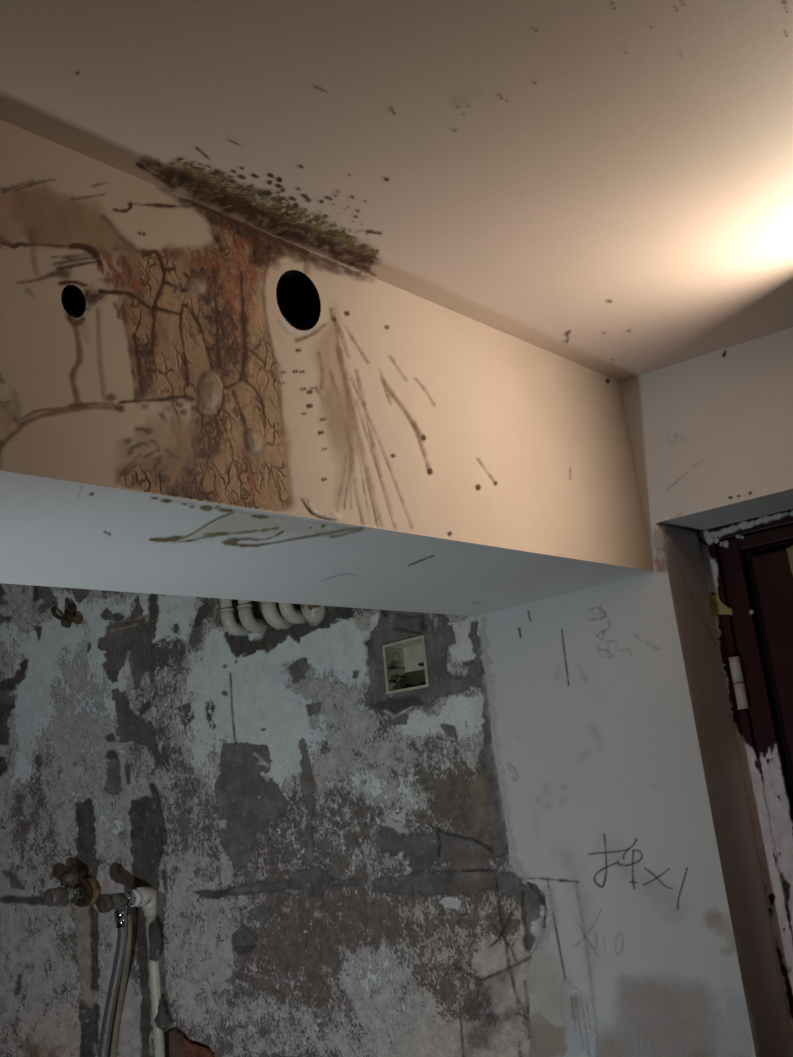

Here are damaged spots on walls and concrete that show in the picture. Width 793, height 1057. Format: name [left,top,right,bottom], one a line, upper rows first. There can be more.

damp [0,310,123,466]
crack [0,203,260,455]
damp [97,158,378,547]
damp [388,387,433,474]
peeling [0,659,28,776]
peeling [87,590,185,795]
peeling [215,742,287,868]
peeling [224,599,353,663]
peeling [353,610,507,858]
peeling [369,817,545,954]
peeling [722,663,793,1038]
spalling [164,1027,215,1057]